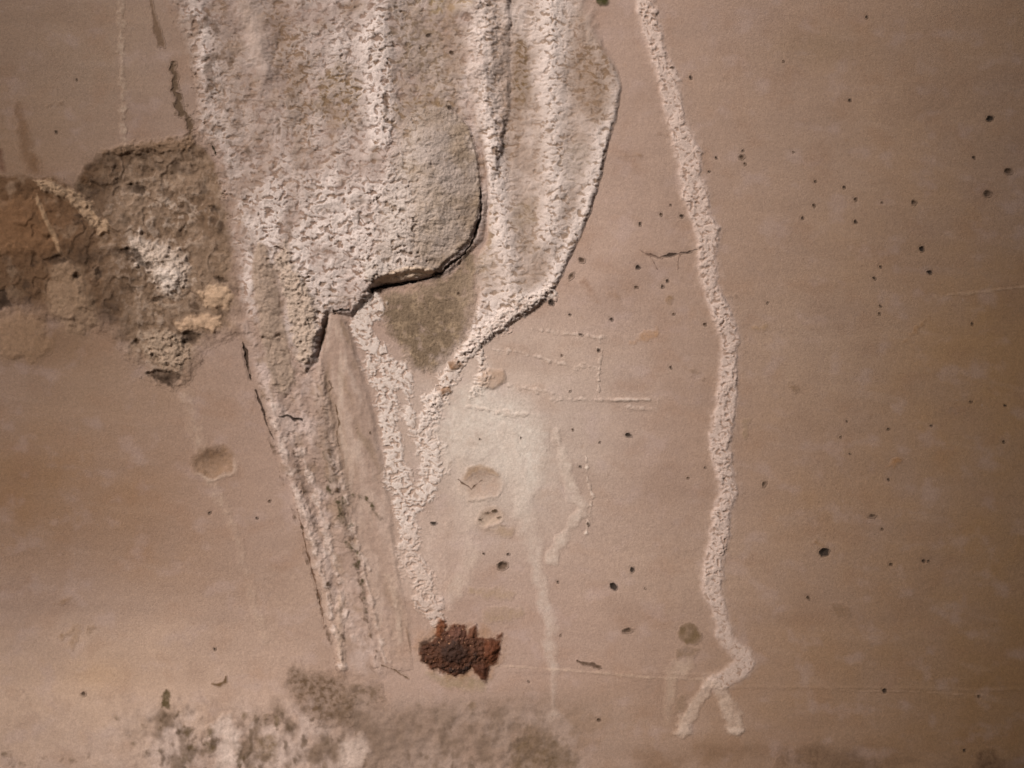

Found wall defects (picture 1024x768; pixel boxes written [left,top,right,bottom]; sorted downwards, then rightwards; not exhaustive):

crack [639,248,698,271]
spalling [0,142,414,680]
crack [242,341,304,440]
crack [327,380,341,450]
damp [100,0,661,768]
damp [629,0,772,740]
crack [296,509,326,630]
rust [410,616,512,697]